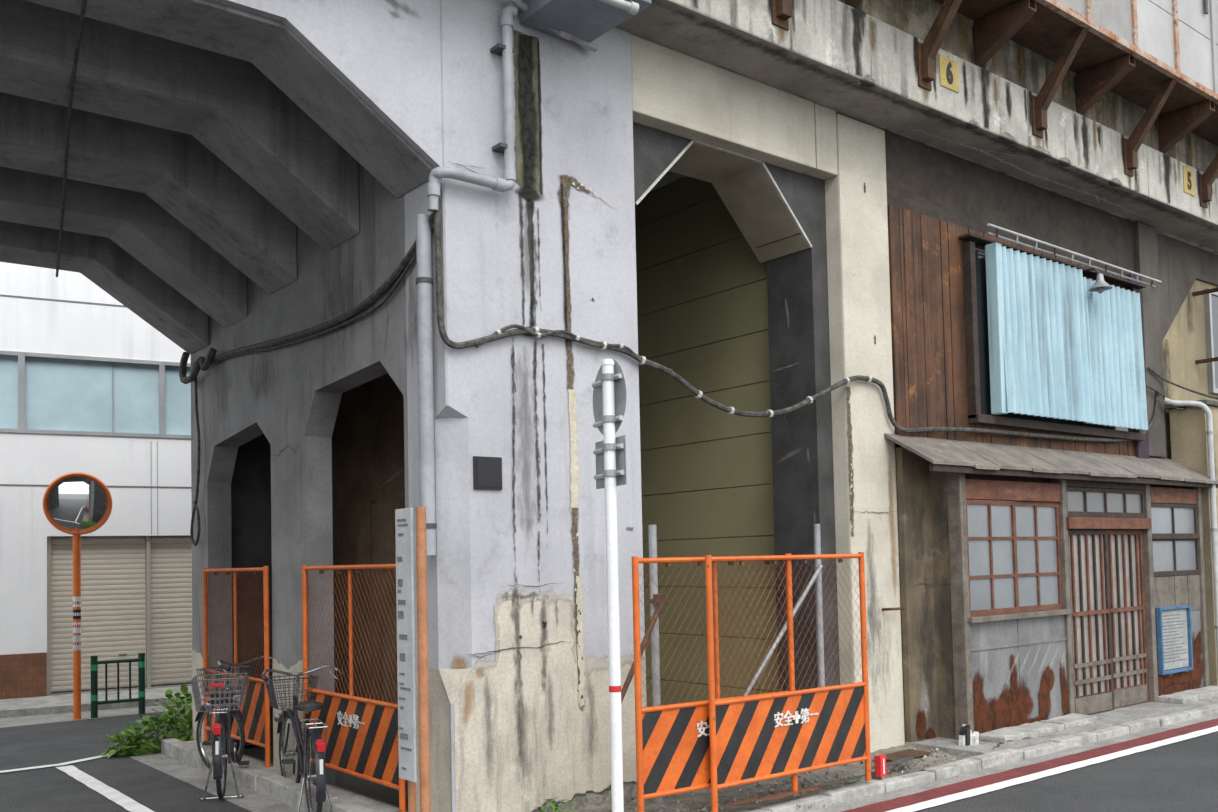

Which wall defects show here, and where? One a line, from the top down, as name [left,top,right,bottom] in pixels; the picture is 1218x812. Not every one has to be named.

water stain [677,0,1213,222]
peeling [415,175,647,812]
water stain [505,30,558,769]
corrosion [973,654,1069,734]
corrosion [1157,631,1203,696]